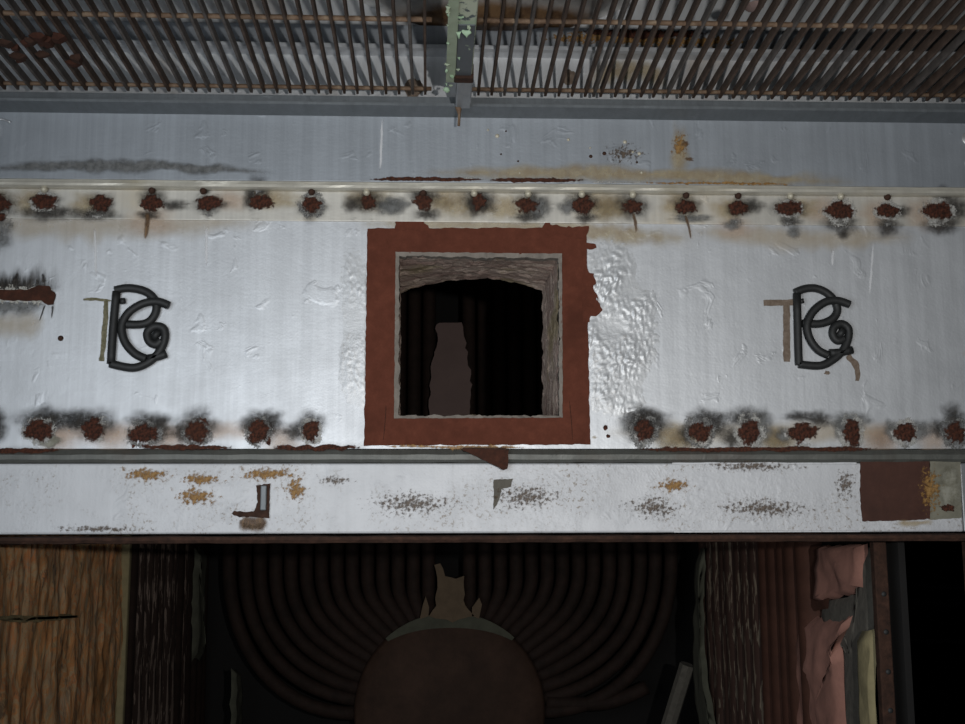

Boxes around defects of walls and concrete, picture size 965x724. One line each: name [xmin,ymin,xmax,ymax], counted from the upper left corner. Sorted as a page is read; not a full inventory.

peeling [445,4,471,45]
rust [25,186,113,220]
rust [140,187,183,238]
rust [195,188,226,217]
rust [297,189,325,218]
rust [346,176,804,237]
rust [873,194,965,234]
rust [0,412,113,454]
rust [127,413,231,451]
rust [242,413,360,451]
rust [122,465,306,505]
rust [624,409,965,522]